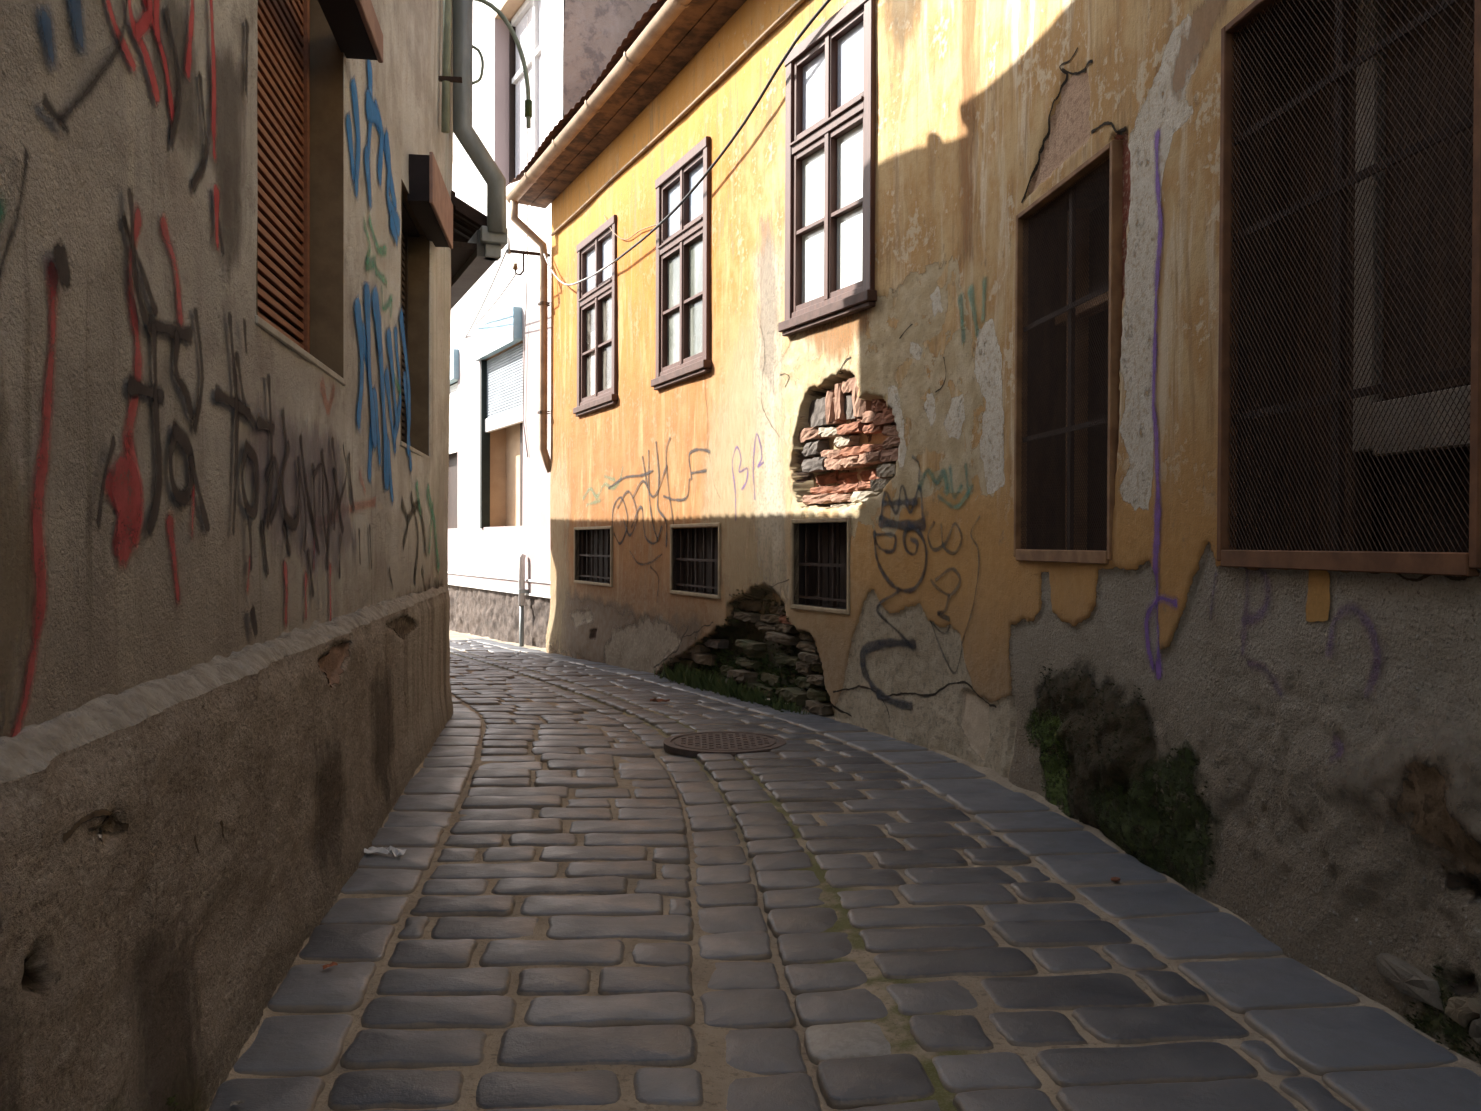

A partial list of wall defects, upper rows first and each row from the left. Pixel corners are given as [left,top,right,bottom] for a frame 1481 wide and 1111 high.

peeling [781,256,1005,538]
spalling [1028,72,1091,196]
peeling [1114,14,1199,511]
spalling [387,614,417,640]
spalling [571,542,1481,1065]